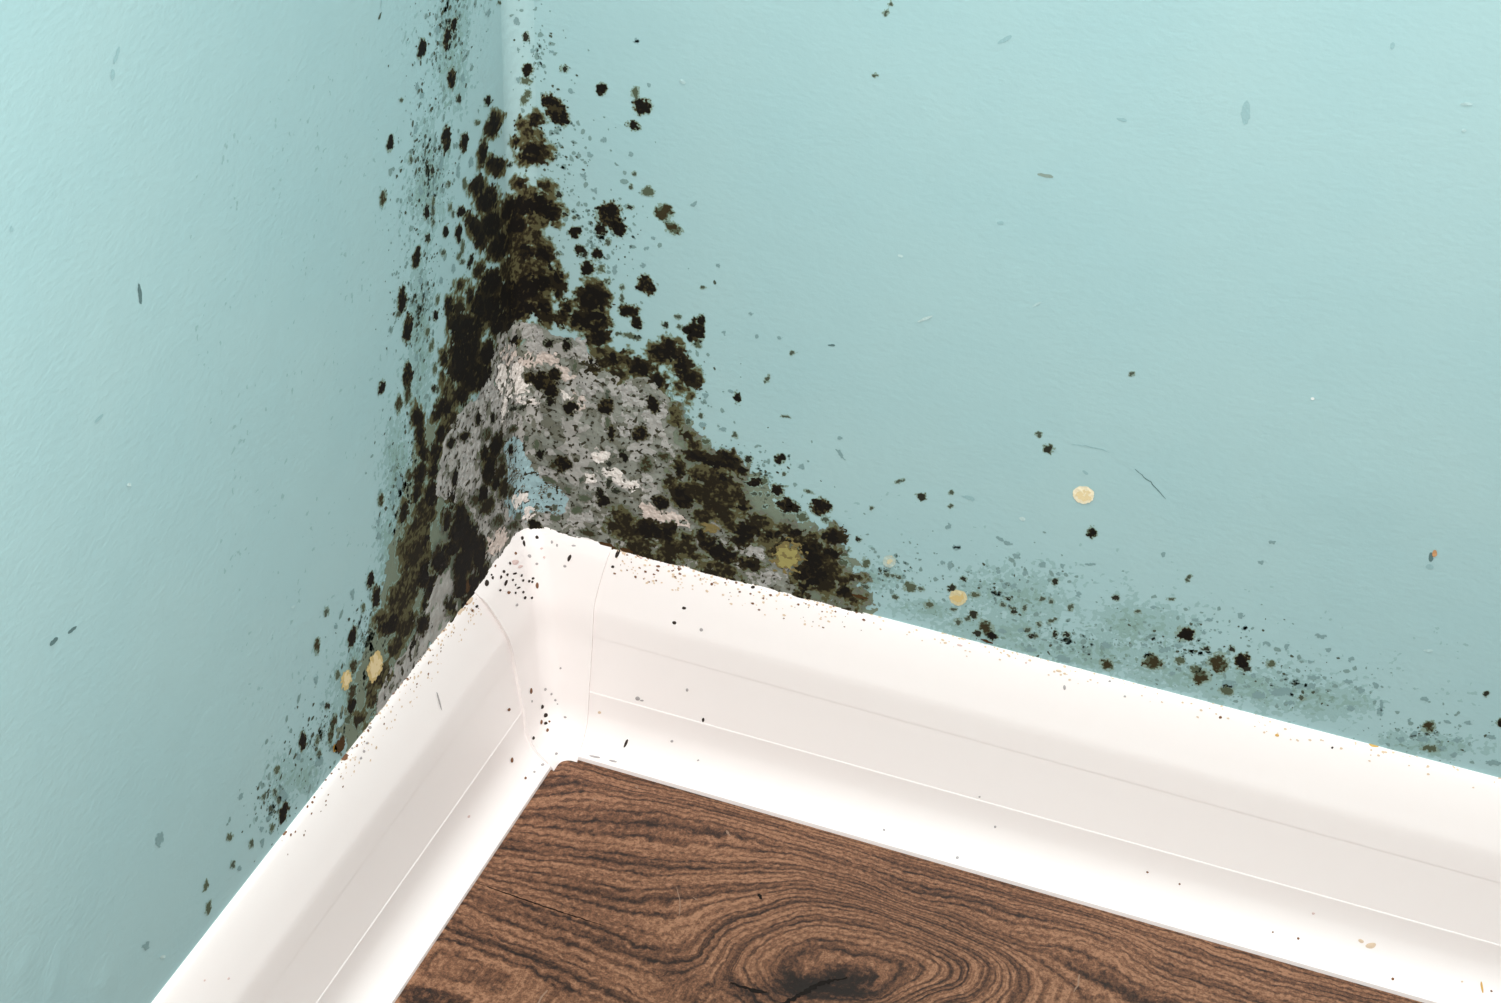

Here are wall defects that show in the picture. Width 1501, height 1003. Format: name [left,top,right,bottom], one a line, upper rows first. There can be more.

peeling [436,320,795,594]
leakage [226,0,1501,871]
leakage [202,878,212,916]